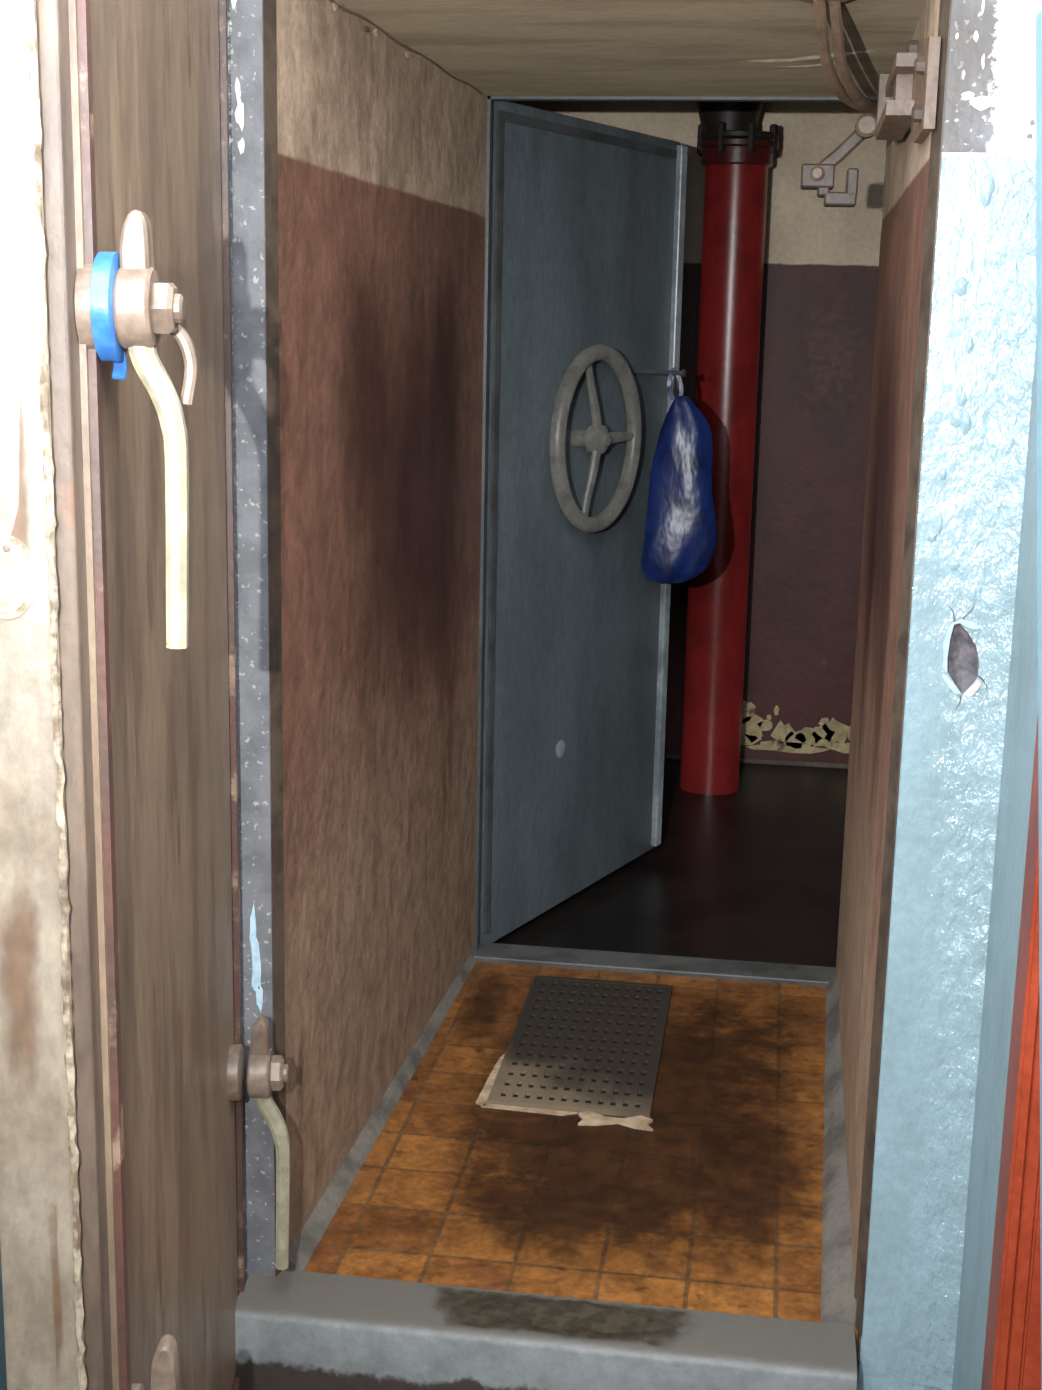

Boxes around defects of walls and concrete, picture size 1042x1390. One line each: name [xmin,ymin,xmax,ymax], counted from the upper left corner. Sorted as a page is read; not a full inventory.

hole [942,604,988,710]
water stain [467,1003,793,1249]
water stain [473,1296,672,1334]